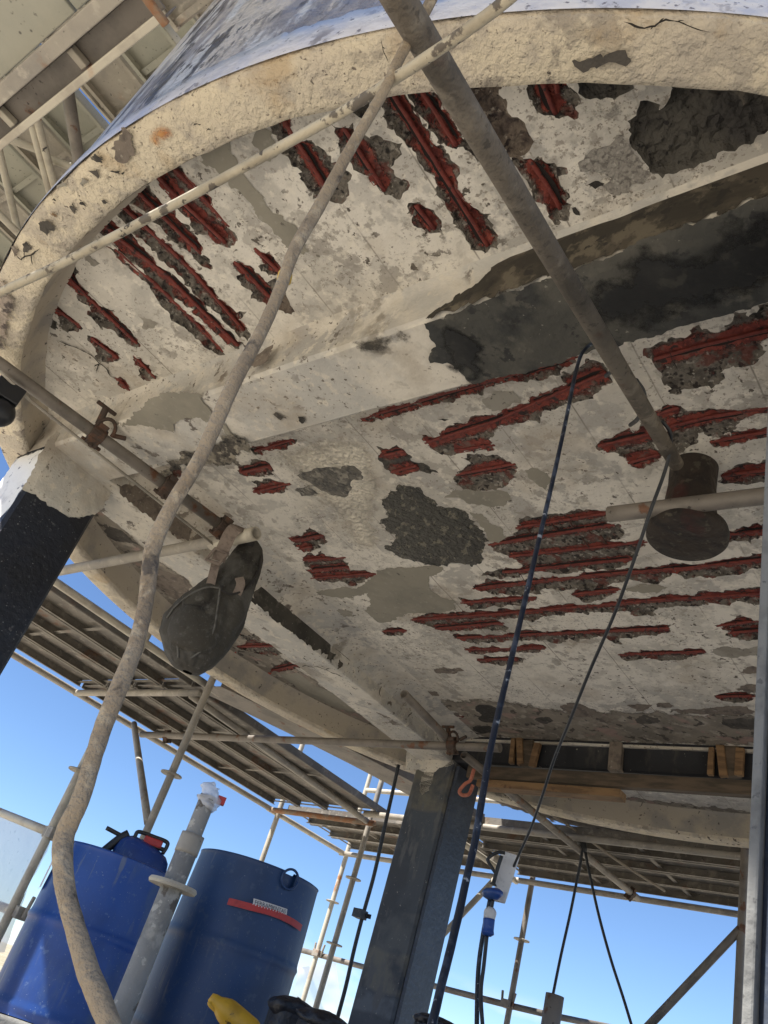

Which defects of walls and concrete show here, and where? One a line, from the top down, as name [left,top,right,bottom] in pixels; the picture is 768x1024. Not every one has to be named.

crack [625,18,707,32]
spalling [50,255,158,381]
spalling [100,166,295,355]
spalling [270,92,498,254]
damp [442,325,482,380]
peeling [360,278,613,491]
damp [426,248,550,319]
spalling [471,50,768,225]
damp [557,162,768,330]
peeling [575,196,768,453]
spalling [288,527,376,586]
spalling [382,509,763,734]